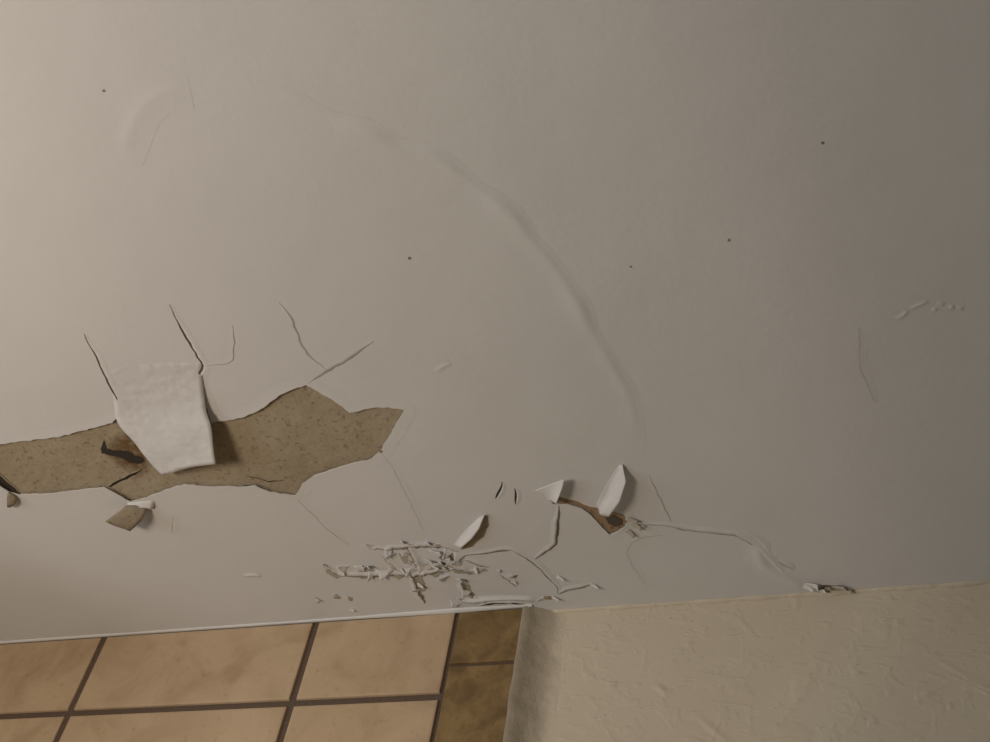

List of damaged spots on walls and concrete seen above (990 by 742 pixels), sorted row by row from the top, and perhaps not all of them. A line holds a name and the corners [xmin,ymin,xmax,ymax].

crack [84,334,119,400]
crack [169,304,235,422]
crack [278,303,373,383]
peeling [0,362,415,531]
peeling [535,464,645,539]
peeling [321,515,519,608]